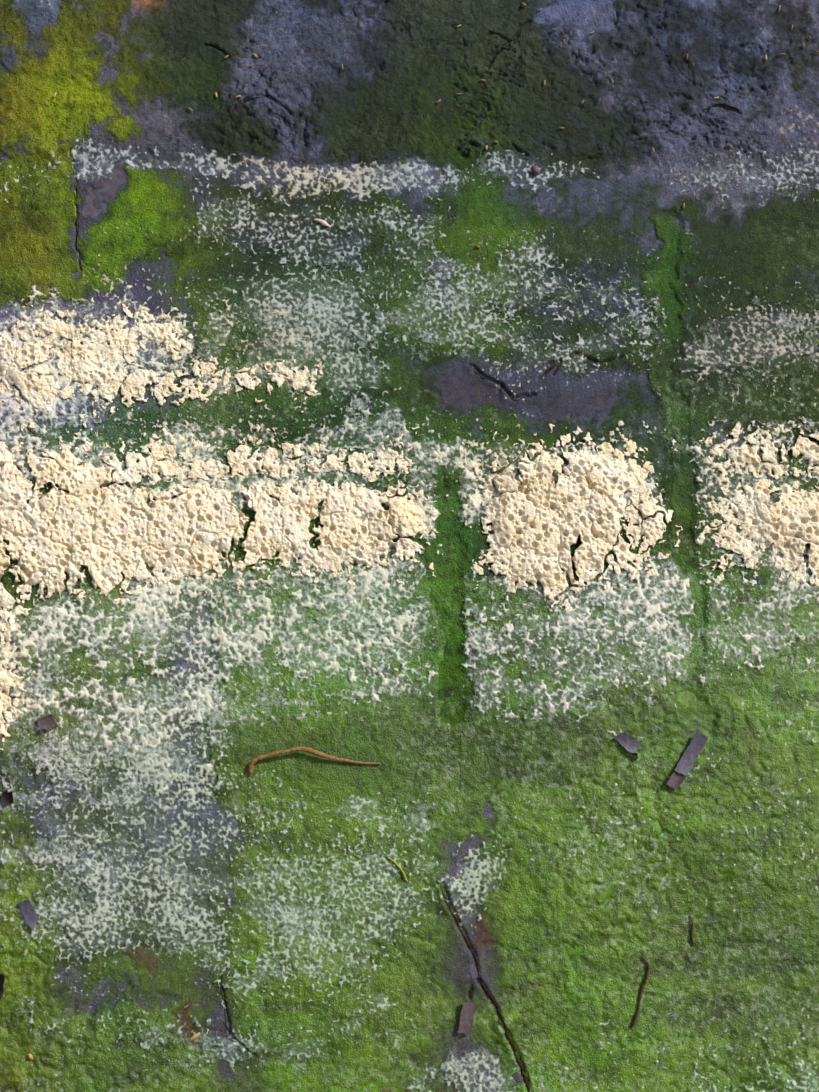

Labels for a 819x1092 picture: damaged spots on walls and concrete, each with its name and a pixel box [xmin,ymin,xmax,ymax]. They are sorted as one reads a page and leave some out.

water stain [671,143,819,201]
water stain [674,296,819,401]
water stain [0,138,666,1044]
water stain [462,388,819,724]
water stain [721,768,818,890]
water stain [96,1009,266,1072]
water stain [426,1052,516,1092]
water stain [692,1008,819,1092]